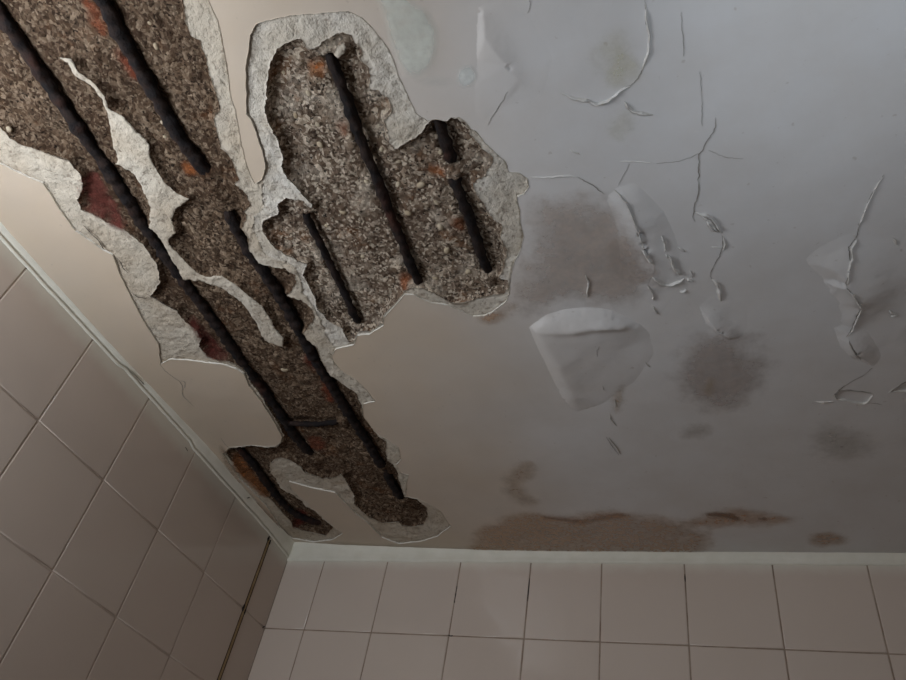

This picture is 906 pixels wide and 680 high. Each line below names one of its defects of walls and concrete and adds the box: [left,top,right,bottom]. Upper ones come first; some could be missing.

crack [560,4,651,106]
corrosion [81,173,123,229]
spalling [0,0,529,544]
crack [531,80,739,314]
crack [815,175,906,405]
corrosion [234,453,266,496]